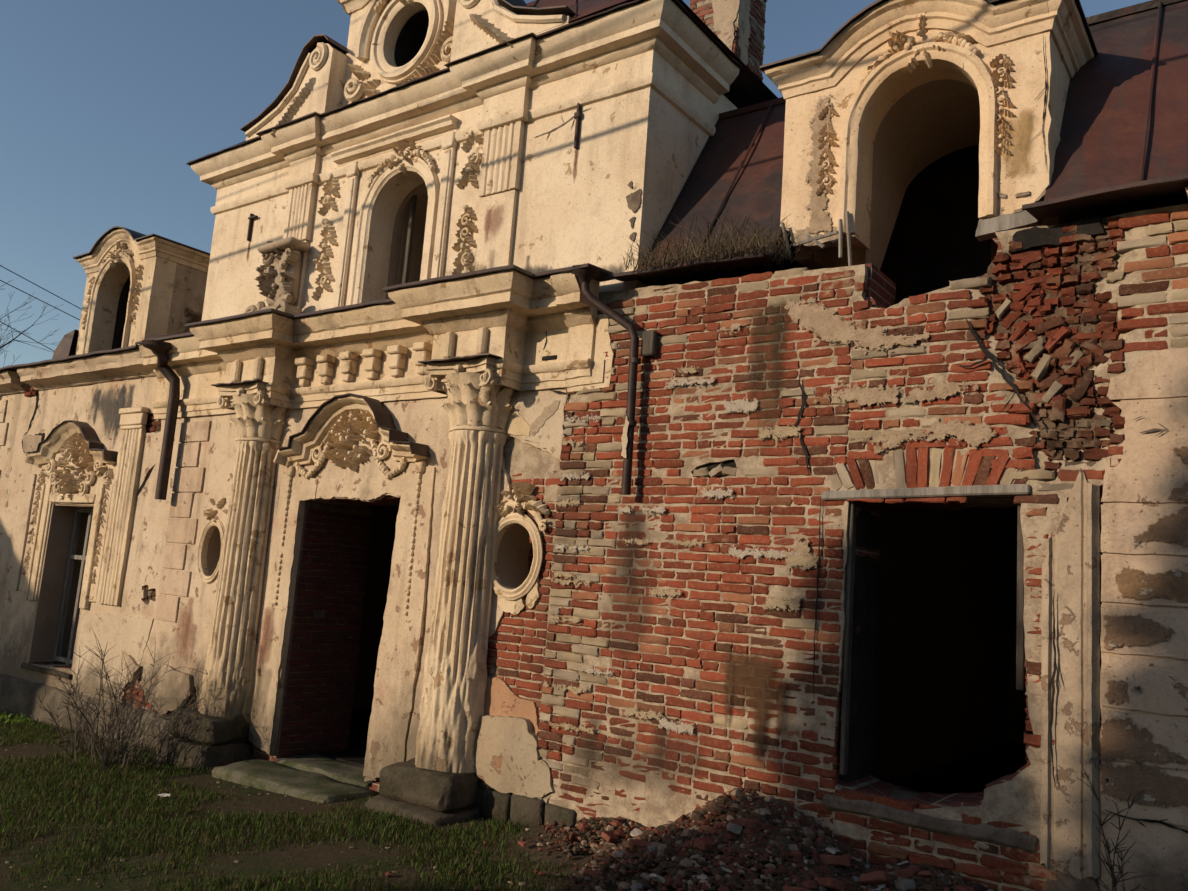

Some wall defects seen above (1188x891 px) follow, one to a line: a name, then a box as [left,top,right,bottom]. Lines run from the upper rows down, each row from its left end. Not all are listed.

crack [1031,38,1047,169]
crack [956,319,1040,428]
spalling [484,93,1188,891]
leakage [724,653,786,760]
crack [1049,596,1061,787]